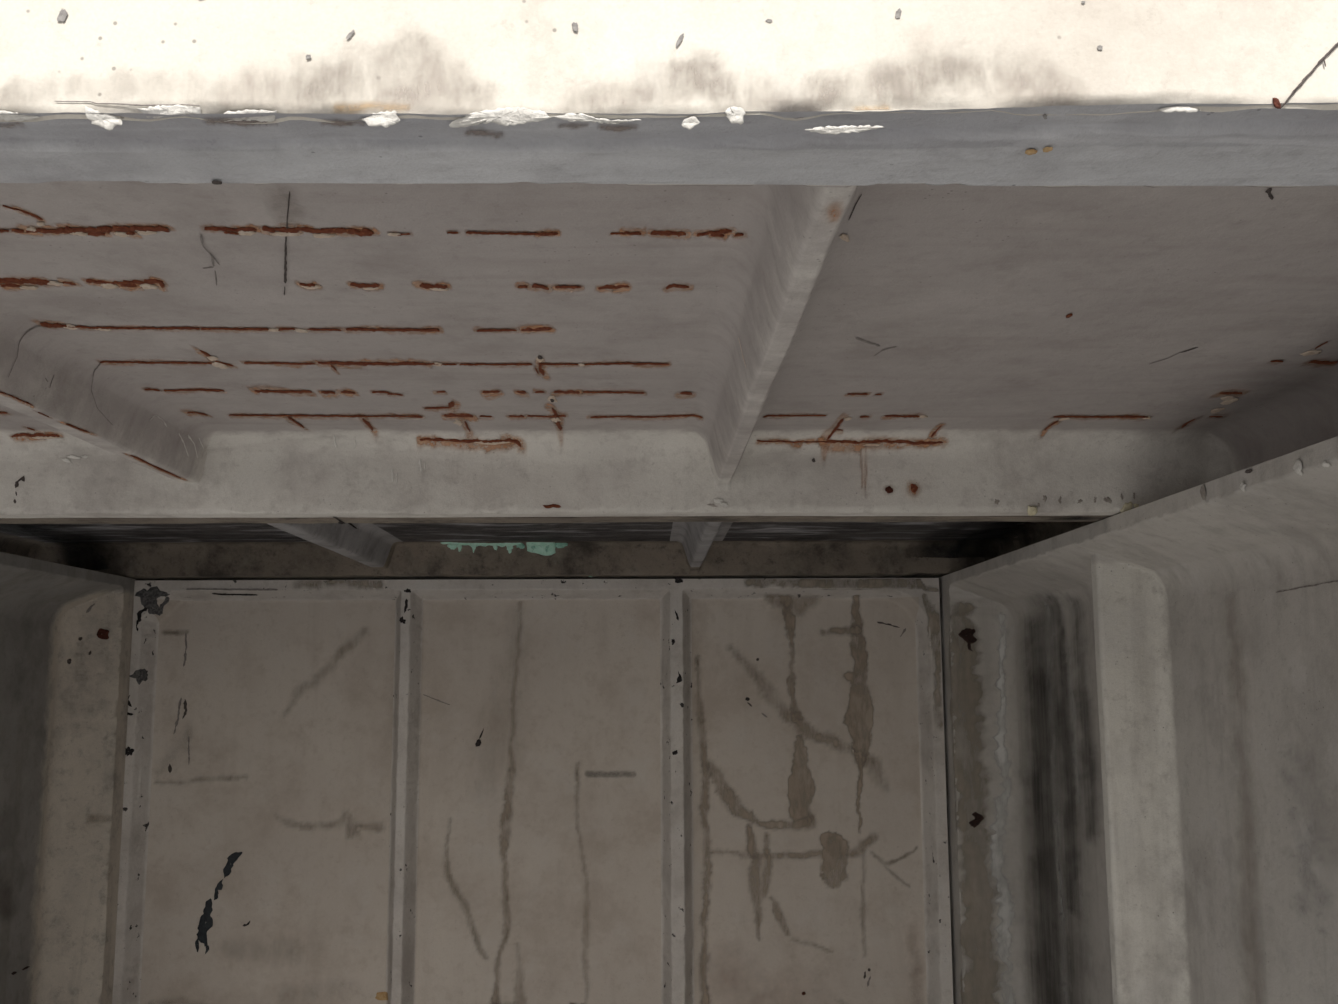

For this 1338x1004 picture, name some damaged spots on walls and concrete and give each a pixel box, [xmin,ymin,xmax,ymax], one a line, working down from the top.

crack [1273,43,1338,109]
peeling [135,586,170,631]
crack [475,728,484,747]
leakage [699,521,1032,1004]
leakage [501,791,511,908]
peeling [195,852,242,954]